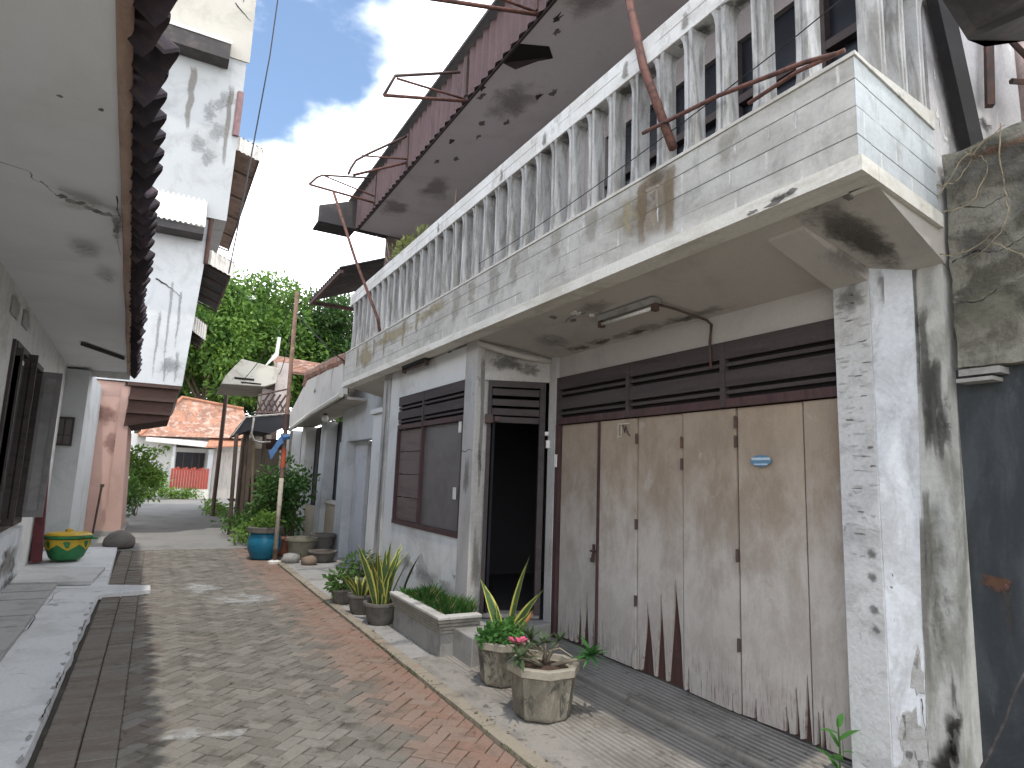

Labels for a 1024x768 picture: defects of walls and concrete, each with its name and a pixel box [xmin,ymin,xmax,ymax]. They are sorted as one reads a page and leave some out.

water stain [185,70,234,163]
crack [112,196,121,255]
spalling [747,188,797,215]
water stain [912,269,951,456]
water stain [919,495,945,661]
peeling [895,644,929,768]